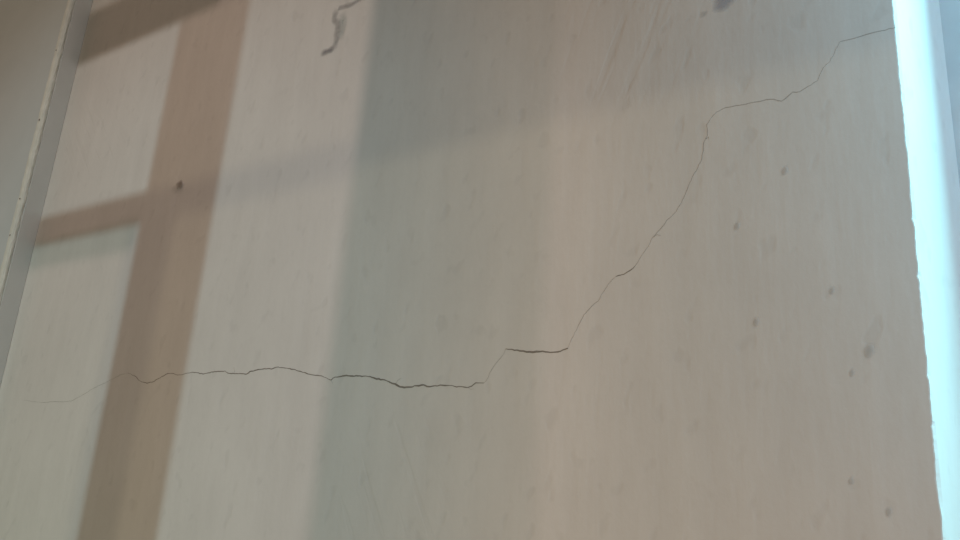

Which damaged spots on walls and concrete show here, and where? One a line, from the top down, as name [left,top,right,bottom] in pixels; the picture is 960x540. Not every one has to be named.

crack [26,27,895,403]